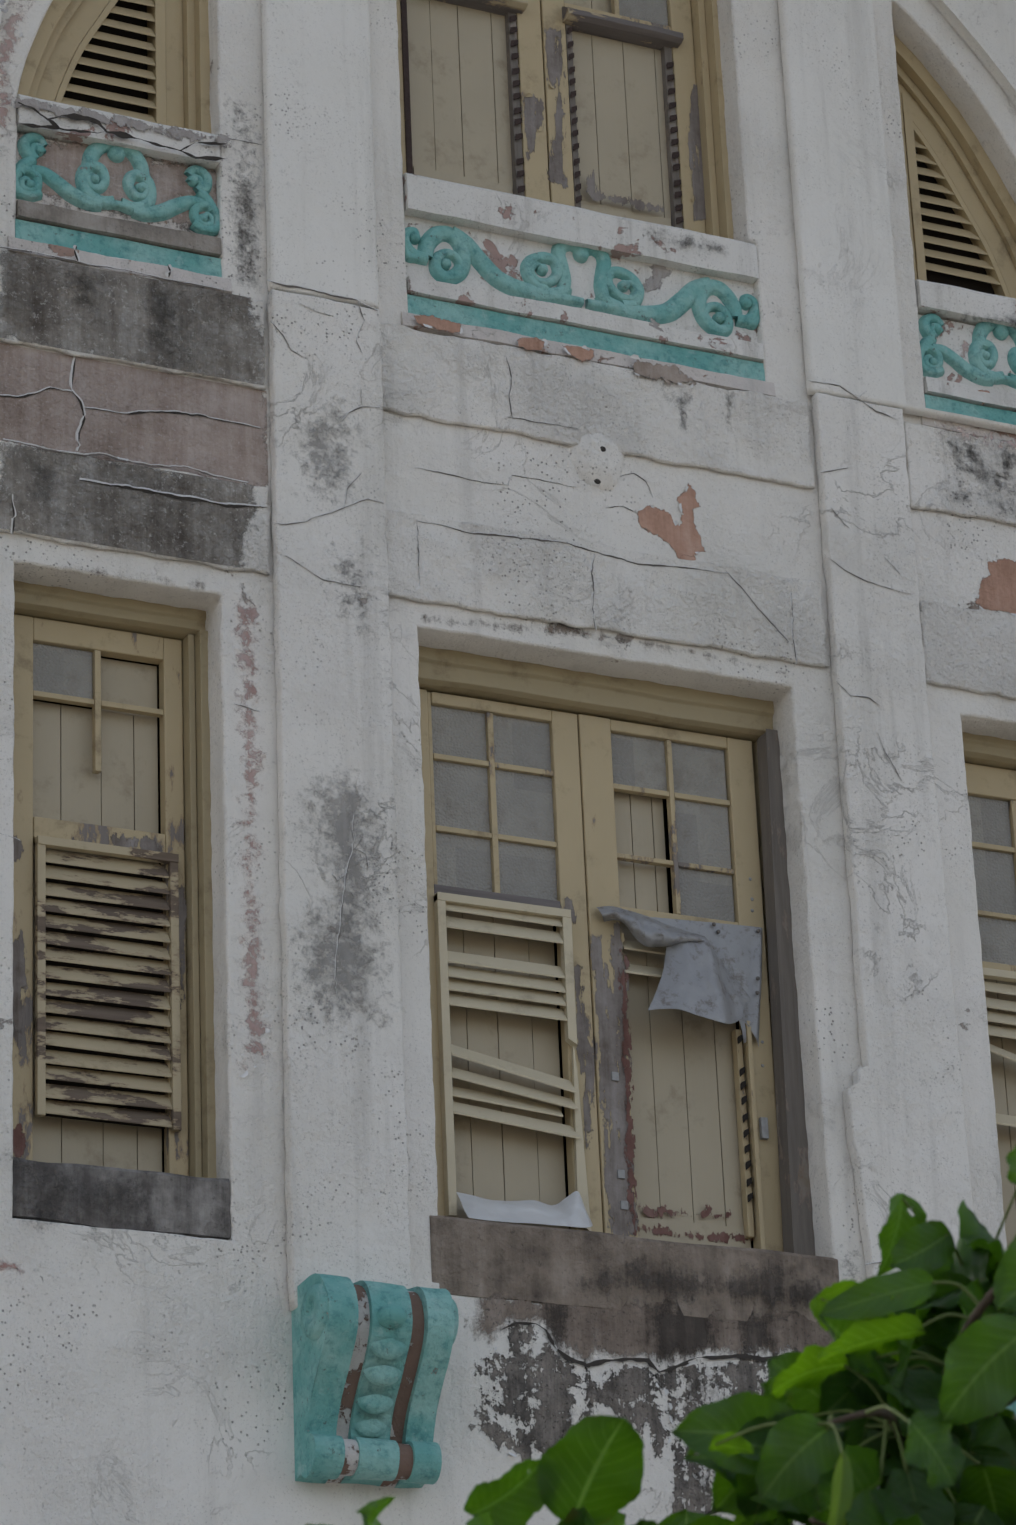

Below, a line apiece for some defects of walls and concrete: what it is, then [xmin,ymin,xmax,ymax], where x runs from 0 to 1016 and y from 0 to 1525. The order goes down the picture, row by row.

spalling [0,0,217,232]
peeling [521,27,665,213]
peeling [685,84,706,221]
water stain [0,251,265,385]
peeling [624,354,697,388]
crack [0,357,384,587]
crack [415,467,576,487]
crack [416,520,797,664]
crack [608,472,653,511]
peeling [637,483,705,561]
peeling [958,558,1016,616]
spalling [468,1321,798,1514]